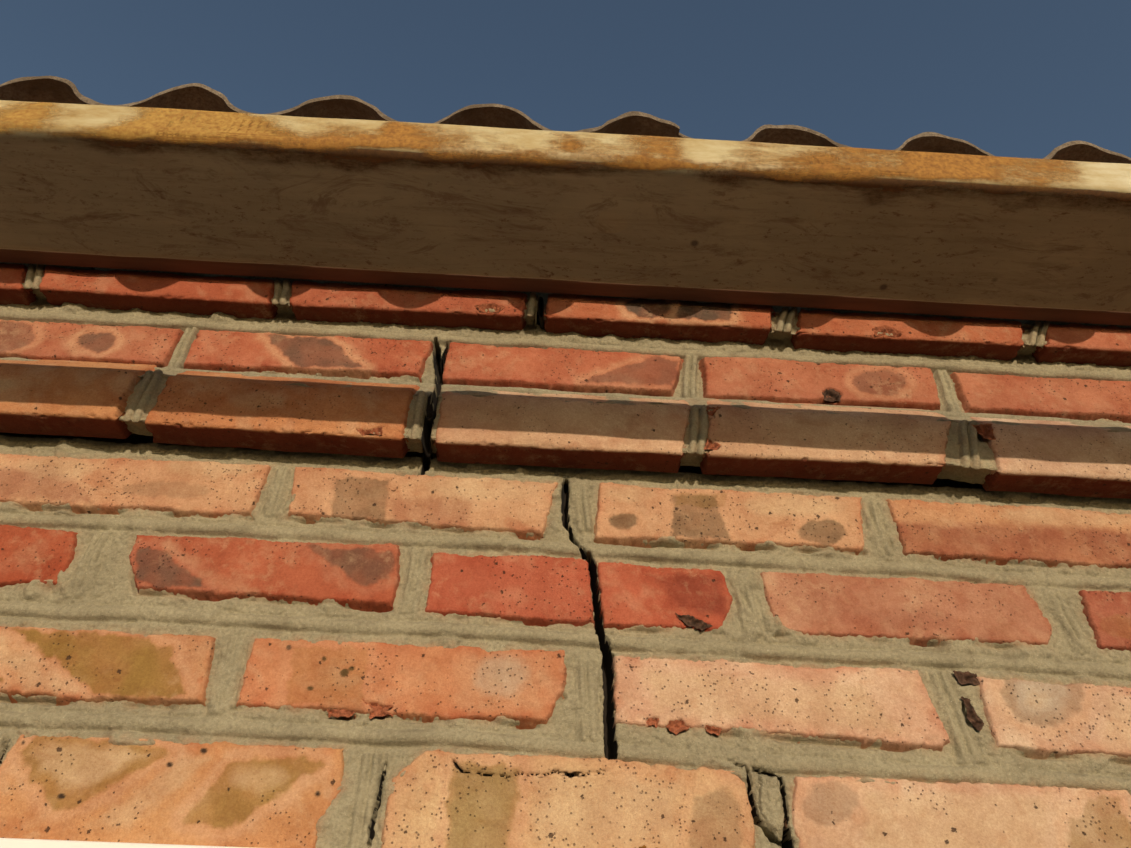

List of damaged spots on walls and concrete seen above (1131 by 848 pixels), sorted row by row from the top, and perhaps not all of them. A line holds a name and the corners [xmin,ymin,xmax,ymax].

crack [421,344,448,475]
crack [453,478,617,779]
spalling [362,699,393,719]
spalling [646,718,690,735]
spalling [705,725,722,736]
crack [746,770,793,848]